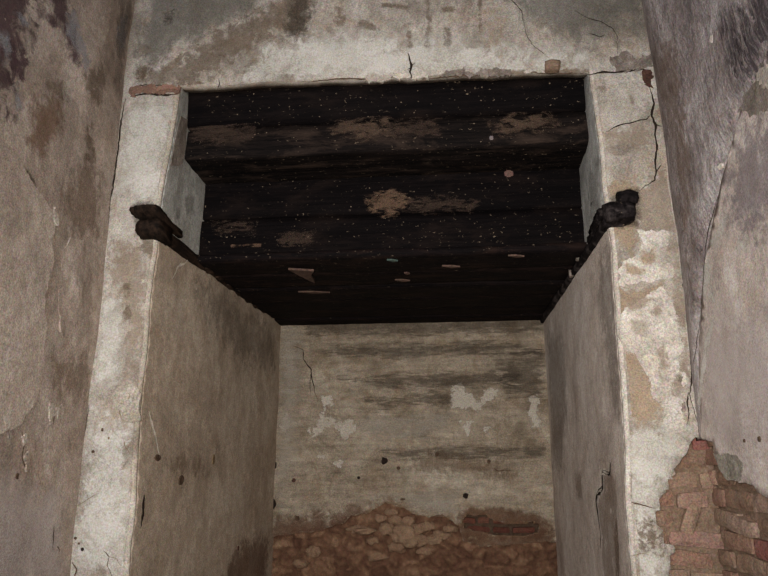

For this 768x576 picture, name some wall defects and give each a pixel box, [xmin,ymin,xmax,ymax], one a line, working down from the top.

leakage [10,44,28,85]
leakage [49,0,80,66]
leakage [236,0,588,83]
crack [578,12,661,187]
crack [686,182,722,433]
crack [295,346,318,402]
peeling [307,395,361,440]
peeling [450,382,499,436]
flaking render [618,229,768,576]
flaking render [272,502,558,576]